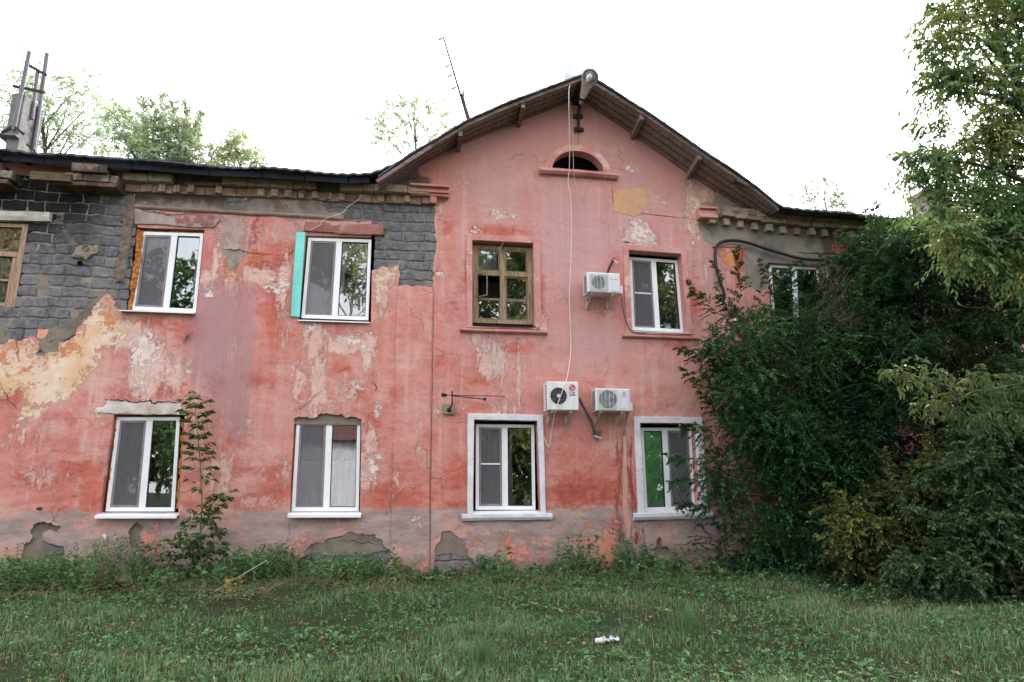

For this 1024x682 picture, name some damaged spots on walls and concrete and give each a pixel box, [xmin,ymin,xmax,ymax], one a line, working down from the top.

peeling [612,187,670,246]
flaking render [684,186,875,291]
flaking render [0,168,445,426]
flaking render [23,507,65,560]
flaking render [287,521,554,574]
peeling [573,513,622,567]